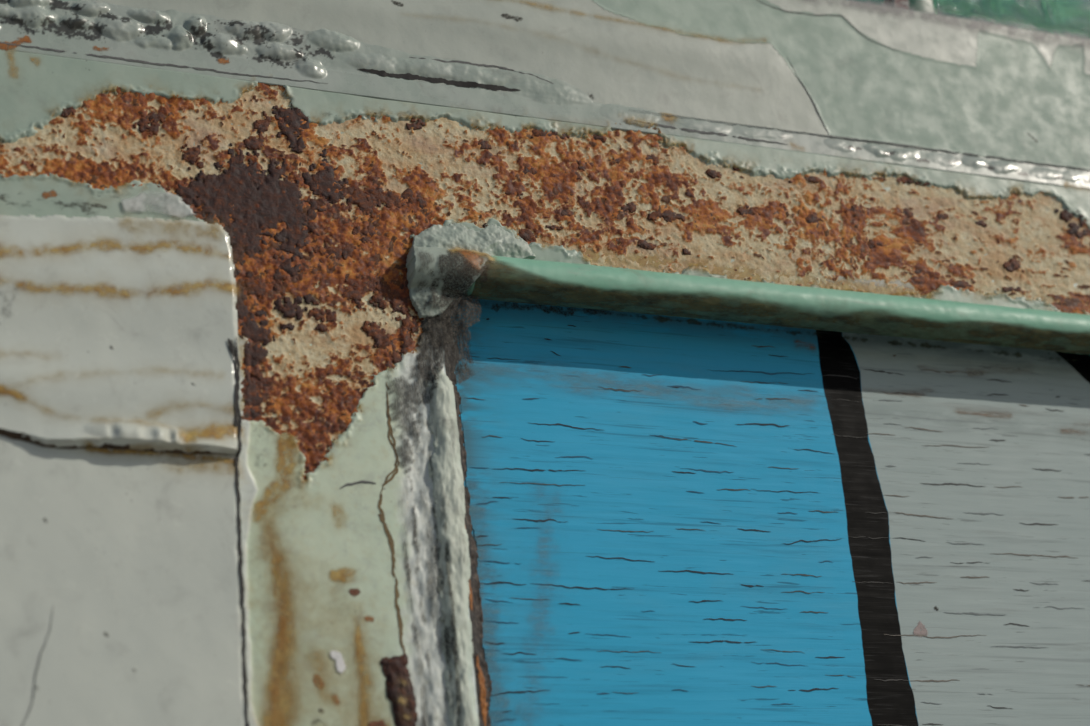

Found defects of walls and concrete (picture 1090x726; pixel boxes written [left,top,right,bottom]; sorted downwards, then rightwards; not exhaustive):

rust [0,36,31,76]
crack [358,57,553,91]
peeling [592,0,1090,170]
peeling [122,192,194,217]
rust [0,83,1090,521]
crack [0,335,250,726]
crack [340,382,405,654]
rust [263,553,293,726]
rust [355,616,418,726]
leakage [404,507,461,726]
rust [477,655,488,726]